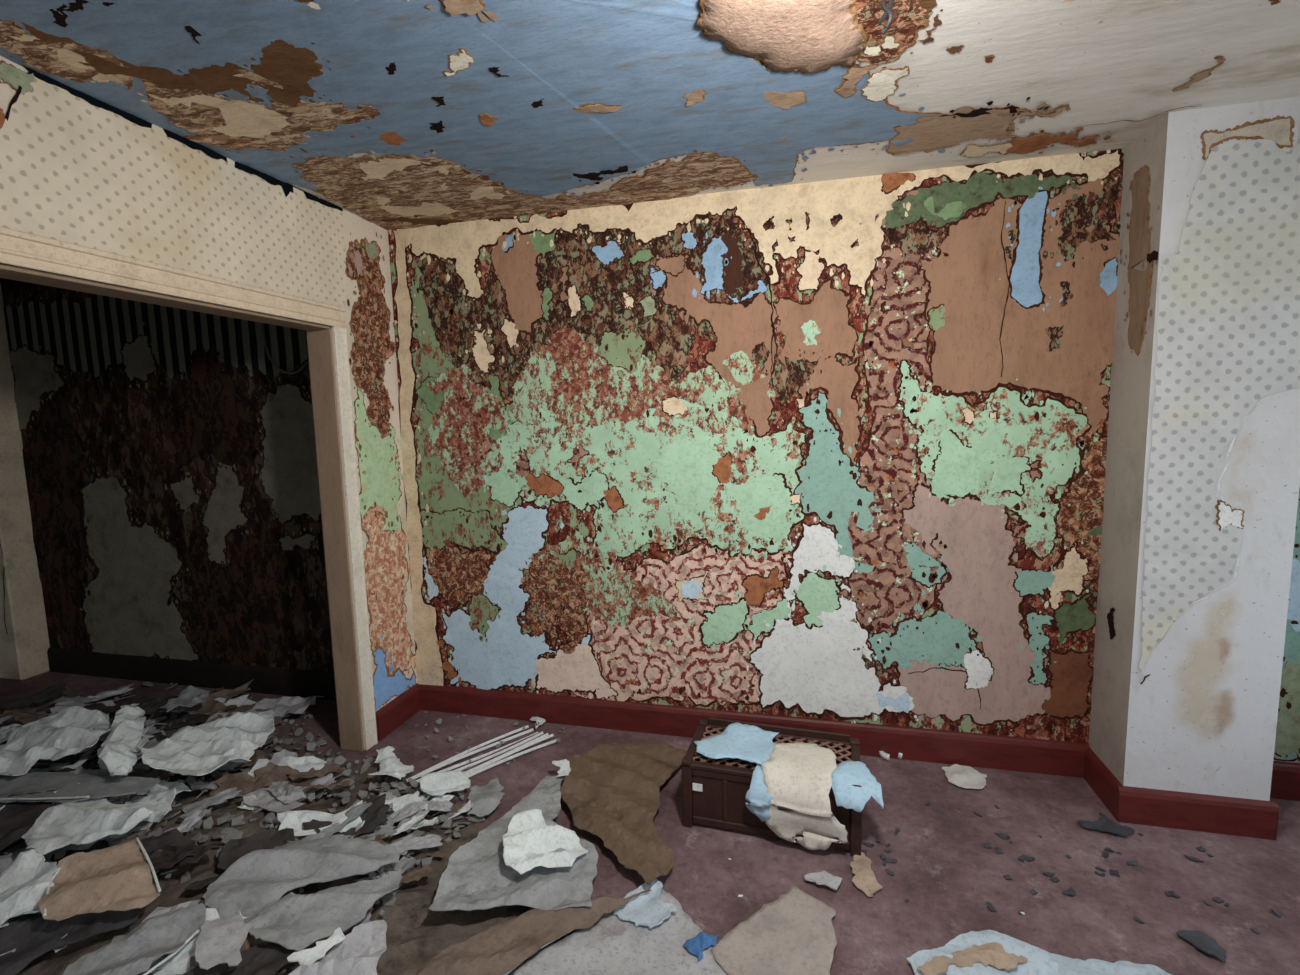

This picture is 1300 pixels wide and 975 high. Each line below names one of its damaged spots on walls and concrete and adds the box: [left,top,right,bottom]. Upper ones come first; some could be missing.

crack [5,66,343,211]
peeling [0,0,1159,726]
peeling [1273,487,1300,762]